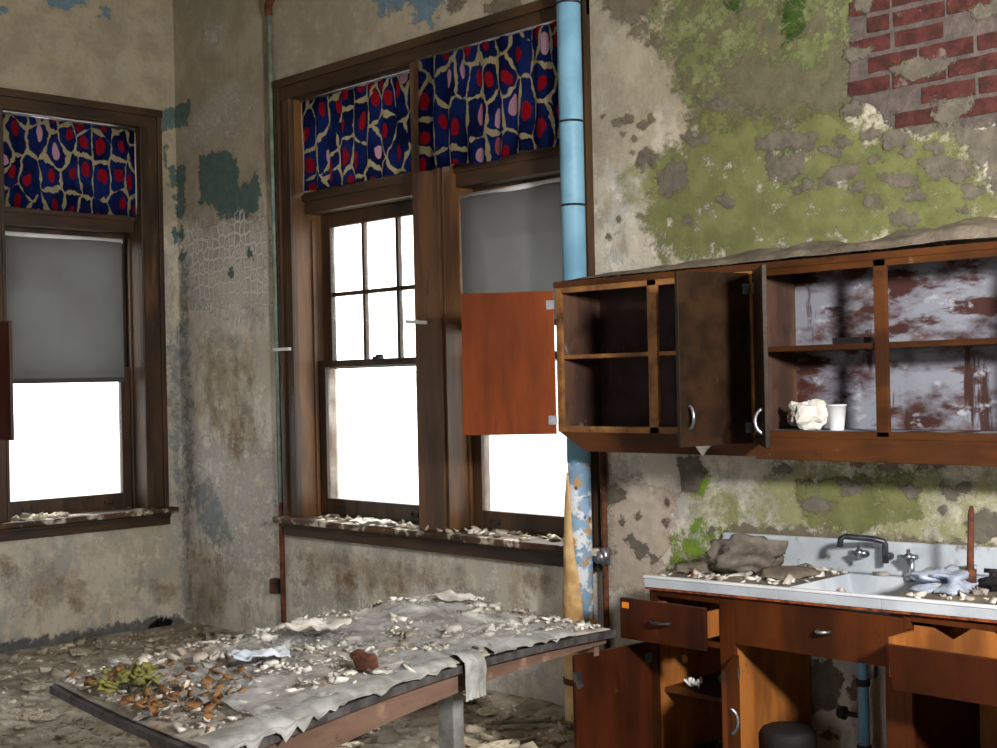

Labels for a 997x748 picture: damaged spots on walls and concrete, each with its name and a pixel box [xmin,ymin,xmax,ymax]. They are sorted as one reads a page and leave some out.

peeling [372,0,467,30]
spalling [483,0,522,14]
peeling [163,145,186,262]
peeling [162,99,191,133]
peeling [197,149,262,221]
spalling [601,113,689,199]
flaking render [657,0,997,237]
peeling [599,454,706,595]